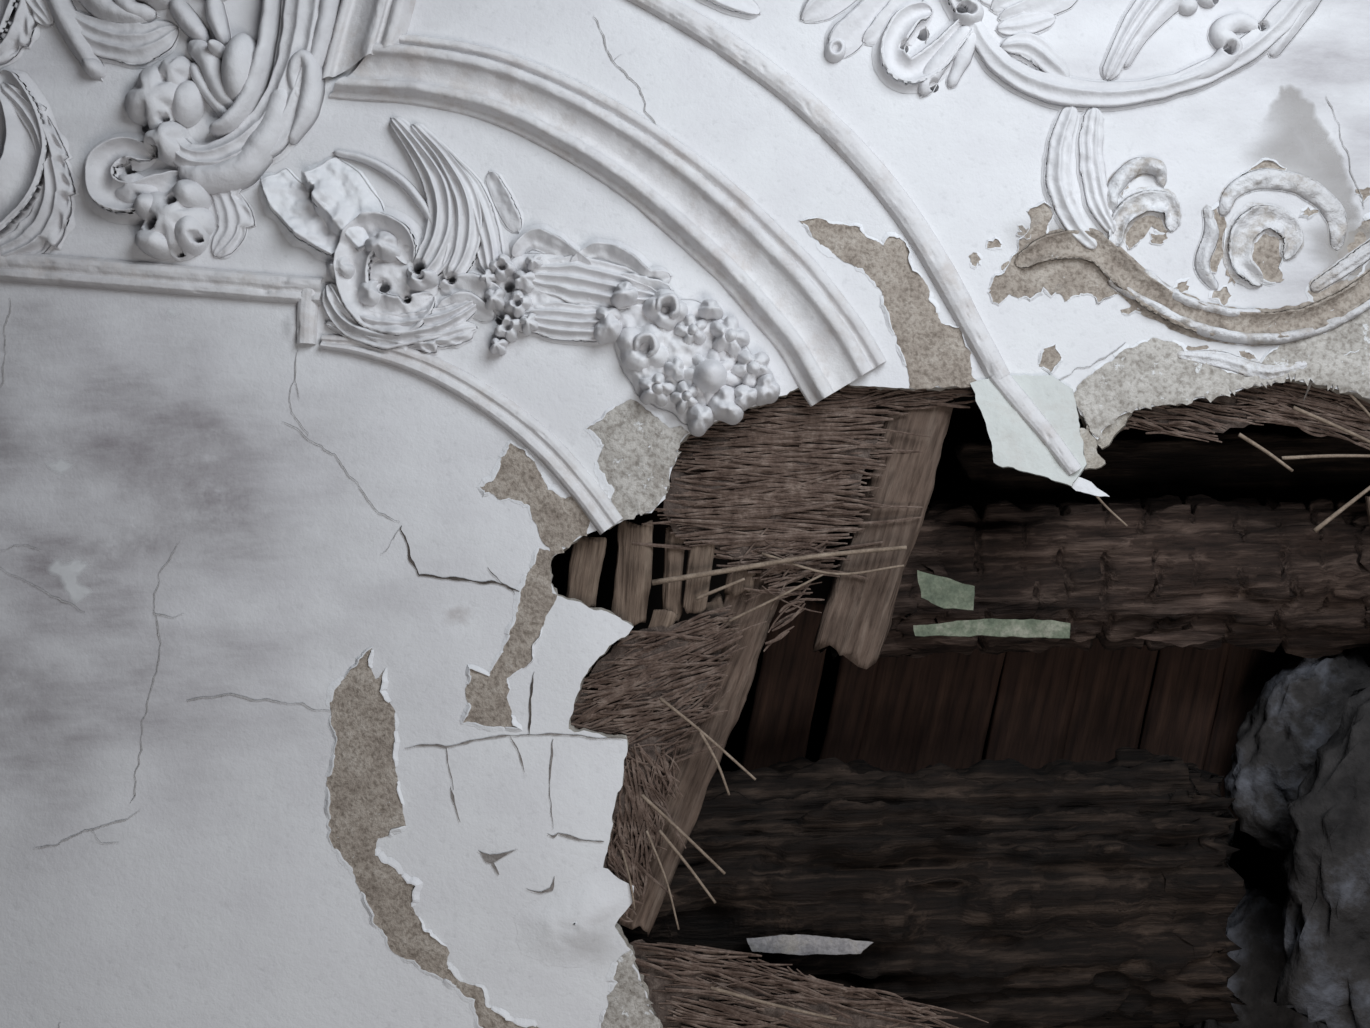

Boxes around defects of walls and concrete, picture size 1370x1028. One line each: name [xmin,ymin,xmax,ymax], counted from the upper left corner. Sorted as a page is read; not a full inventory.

peeling [799,217,978,389]
peeling [969,201,1141,316]
peeling [1074,309,1370,437]
crack [286,351,518,592]
peeling [584,398,690,520]
peeling [460,440,590,732]
crack [36,545,181,848]
crack [187,693,331,711]
peeling [324,646,538,1028]
crack [404,674,624,842]
crack [478,850,555,893]
peeling [598,950,660,1028]